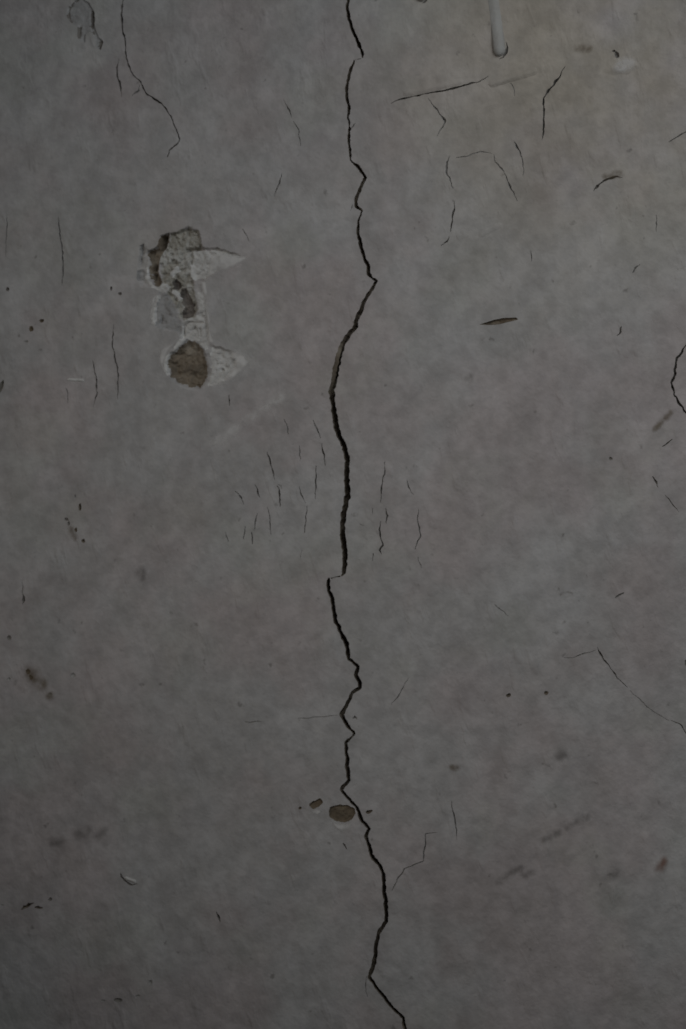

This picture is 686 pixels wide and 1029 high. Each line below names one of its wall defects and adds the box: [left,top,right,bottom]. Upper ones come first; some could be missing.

crack [116,0,180,157]
crack [391,67,565,246]
spalling [136,225,248,391]
crack [670,345,686,413]
crack [225,0,457,1029]
spalling [299,798,373,822]